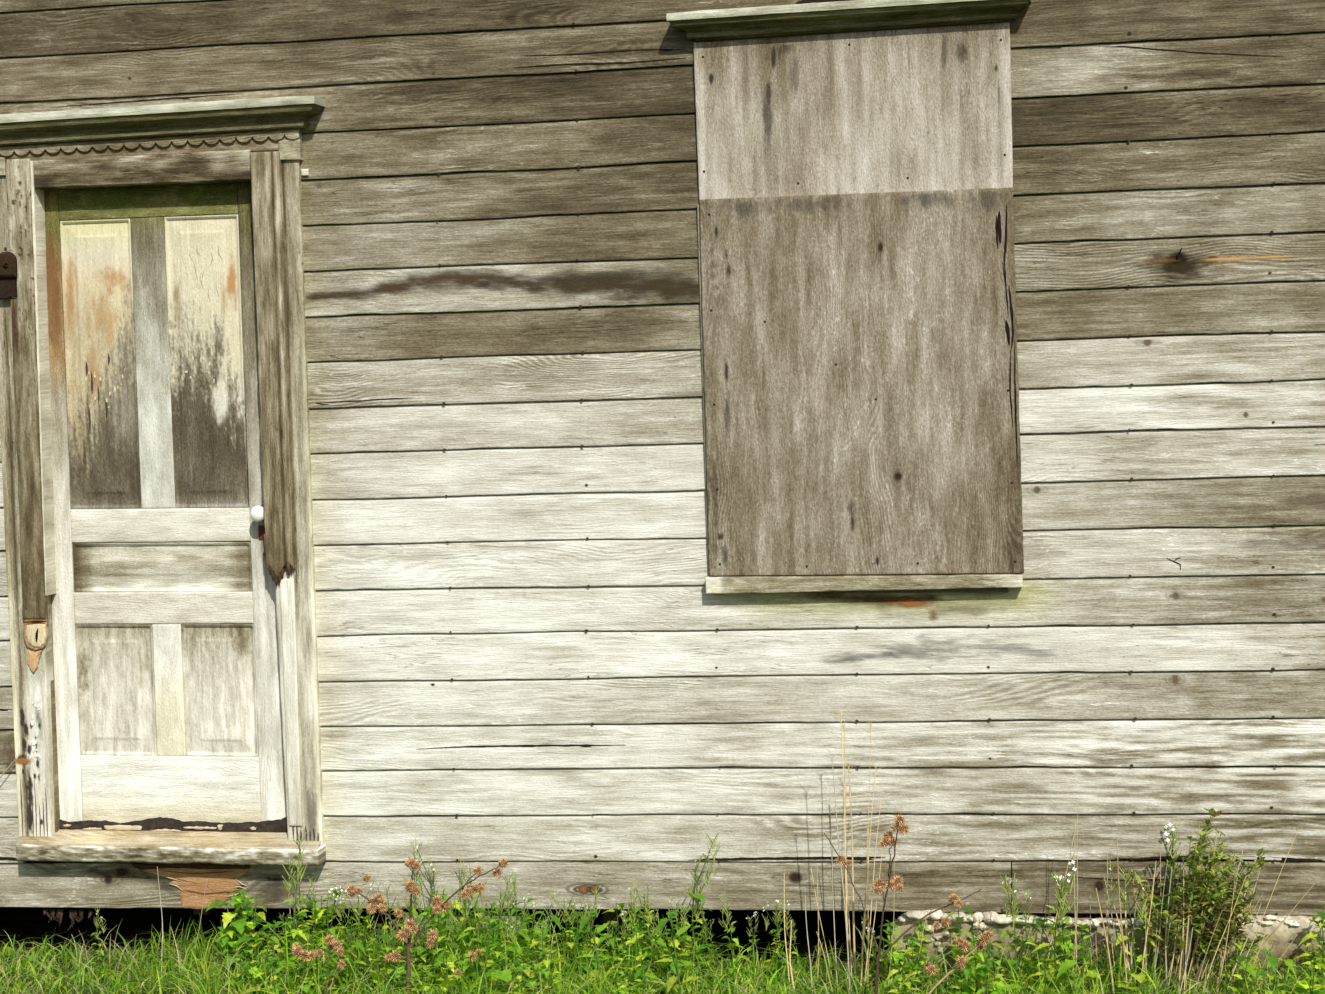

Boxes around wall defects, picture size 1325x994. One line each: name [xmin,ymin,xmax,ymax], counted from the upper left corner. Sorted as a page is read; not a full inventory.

leakage [308,271,700,300]
peeling [85,353,123,430]
rust [805,593,937,619]
peeling [18,664,48,837]
crack [426,742,612,750]